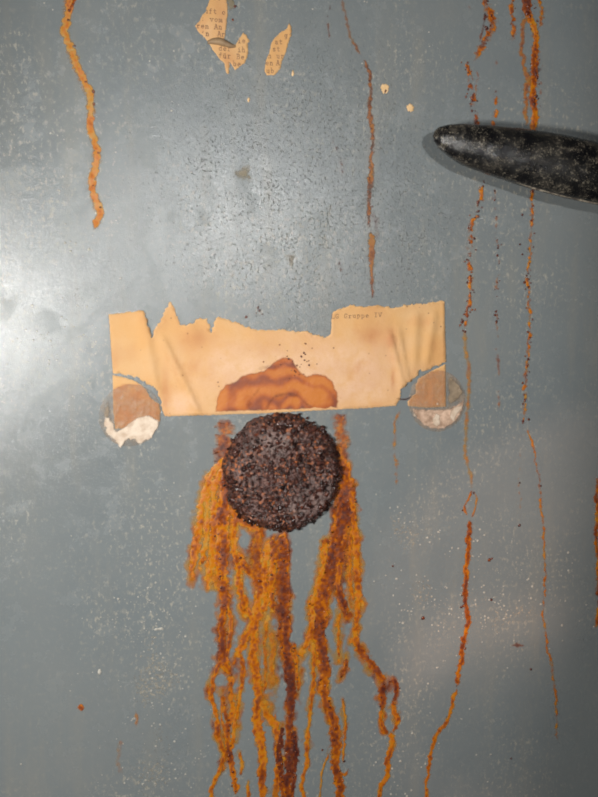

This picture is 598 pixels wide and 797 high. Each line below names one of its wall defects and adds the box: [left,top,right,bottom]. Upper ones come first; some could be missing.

corrosion [60,0,104,228]
corrosion [365,61,376,297]
corrosion [461,0,496,125]
corrosion [509,0,543,130]
corrosion [459,180,485,462]
corrosion [519,189,537,465]
corrosion [185,343,401,797]
corrosion [425,491,477,797]
corrosion [539,479,553,666]